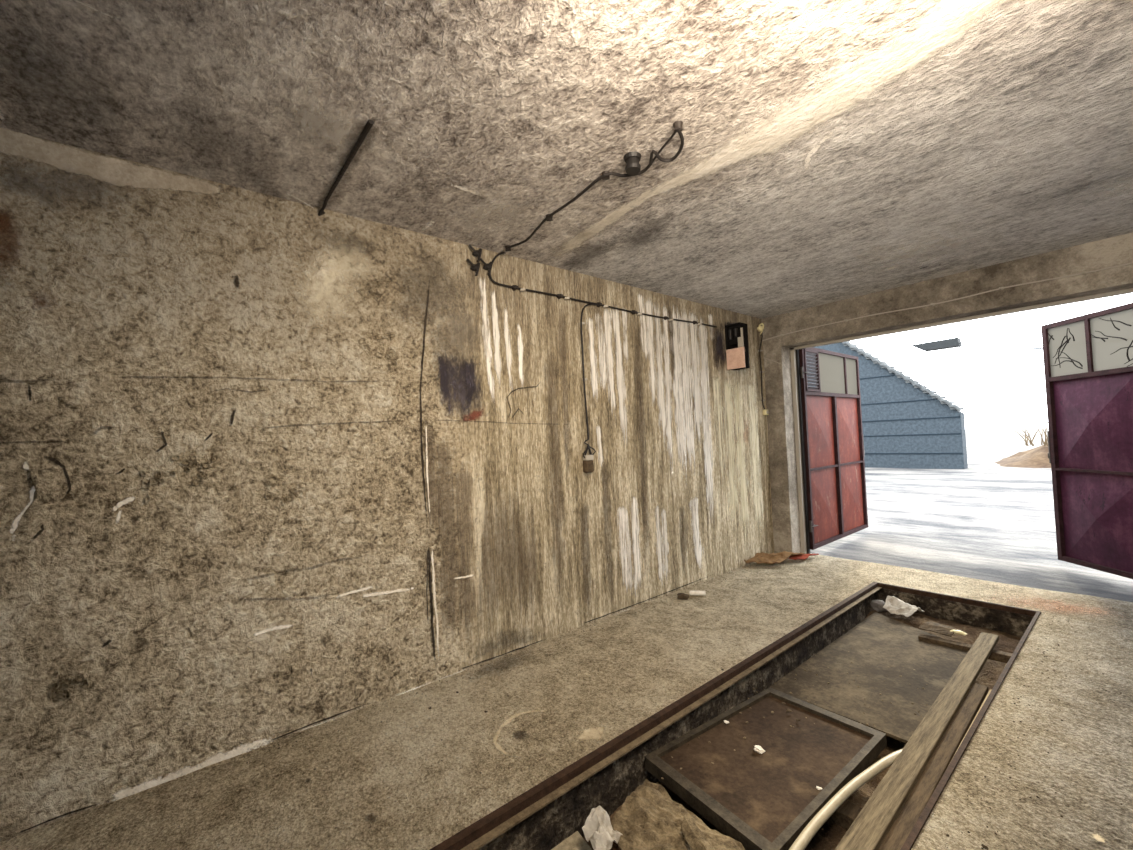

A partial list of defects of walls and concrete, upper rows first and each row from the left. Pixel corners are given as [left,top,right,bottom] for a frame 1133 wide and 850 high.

damp [480,279,523,397]
crack [122,376,266,441]
crack [420,280,430,518]
crack [475,384,539,424]
damp [549,318,568,567]
damp [586,294,763,594]
crack [426,547,542,669]
damp [582,506,590,601]
crack [585,575,711,623]
crack [268,703,368,742]
crack [16,804,96,834]